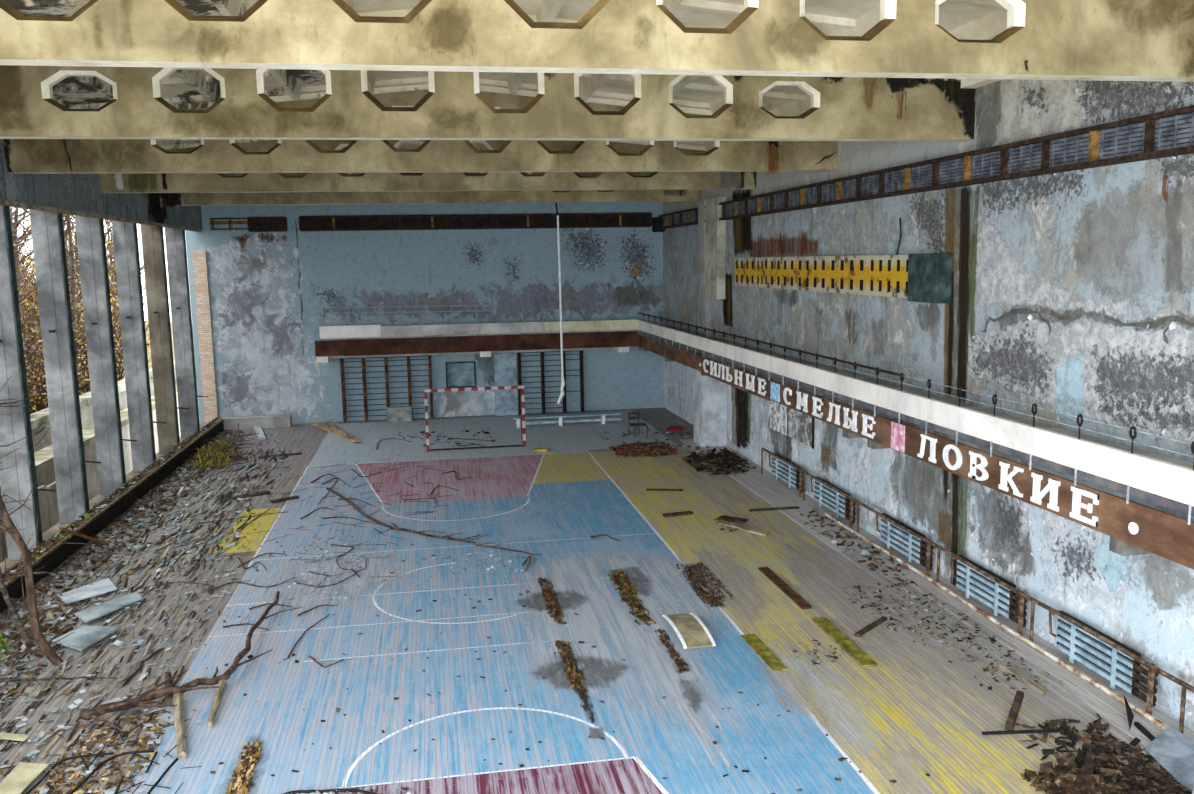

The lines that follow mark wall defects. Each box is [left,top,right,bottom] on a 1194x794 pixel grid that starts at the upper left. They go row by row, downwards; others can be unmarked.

water stain [0,65,68,196]
peeling [201,224,350,424]
crack [981,307,1194,344]